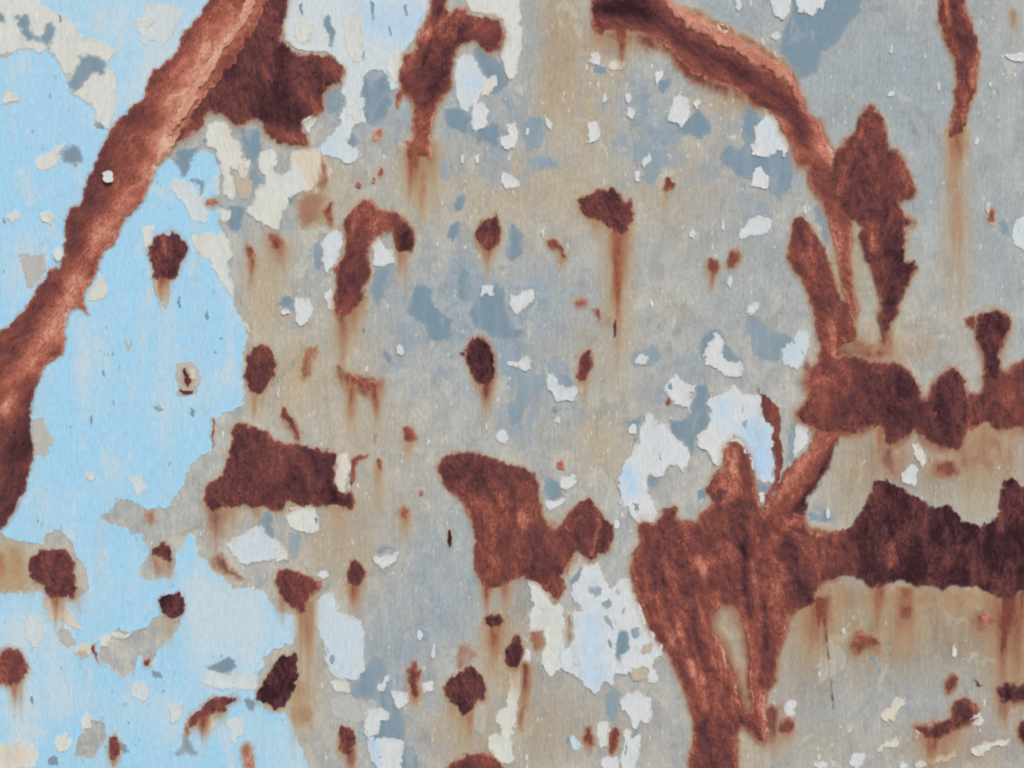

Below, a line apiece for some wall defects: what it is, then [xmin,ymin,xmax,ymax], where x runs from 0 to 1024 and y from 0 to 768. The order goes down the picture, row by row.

corrosion [0,0,346,529]
peeling [0,0,430,768]
corrosion [204,344,382,537]
corrosion [316,167,416,419]
corrosion [396,0,504,208]
peeling [614,329,775,529]
peeling [739,216,772,239]
peeling [721,107,793,201]
corrosion [590,0,1024,768]
peeling [421,681,434,693]
corrosion [437,450,614,702]
peeling [473,562,662,768]